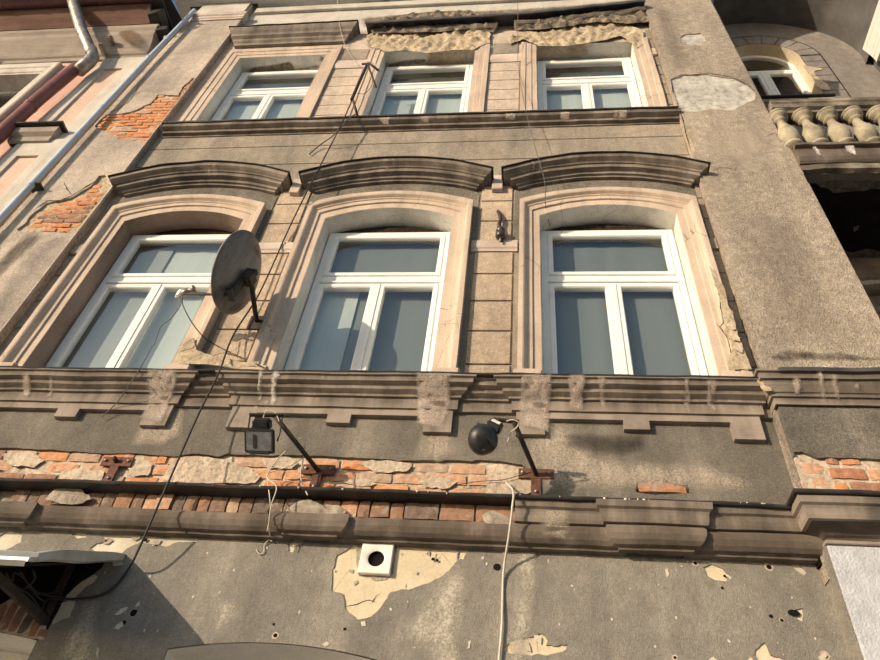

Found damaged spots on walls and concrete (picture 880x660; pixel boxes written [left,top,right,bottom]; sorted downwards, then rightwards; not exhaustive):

spalling [366,10,501,65]
spalling [507,8,649,60]
spalling [96,79,194,142]
spalling [19,177,111,234]
peeling [844,249,880,258]
spalling [710,267,751,370]
spalling [0,450,531,494]
spalling [795,454,880,491]
peeling [332,545,468,626]
peeling [504,634,567,656]
peeling [748,643,782,660]